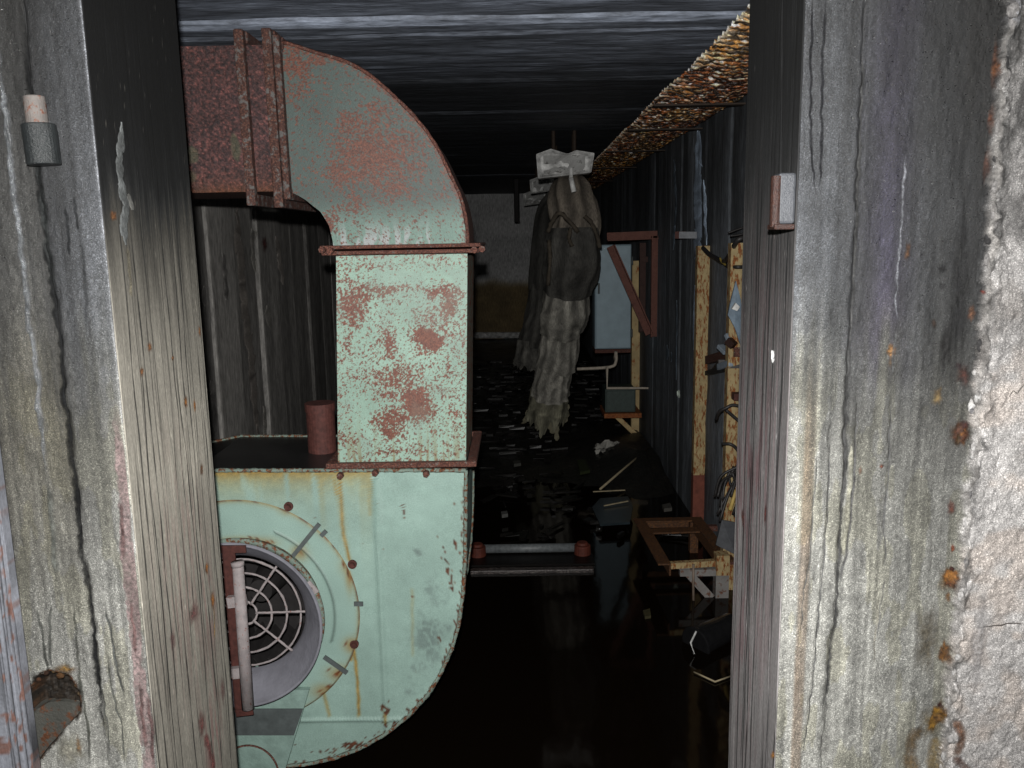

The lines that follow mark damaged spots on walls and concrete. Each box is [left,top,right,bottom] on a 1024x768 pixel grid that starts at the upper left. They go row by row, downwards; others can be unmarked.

crack [25,55,33,95]
damp [0,78,44,450]
damp [895,169,906,312]
crack [36,166,125,757]
crack [801,59,892,747]
corrosion [952,422,968,444]
corrosion [942,567,960,600]
corrosion [938,641,951,661]
corrosion [906,703,967,768]